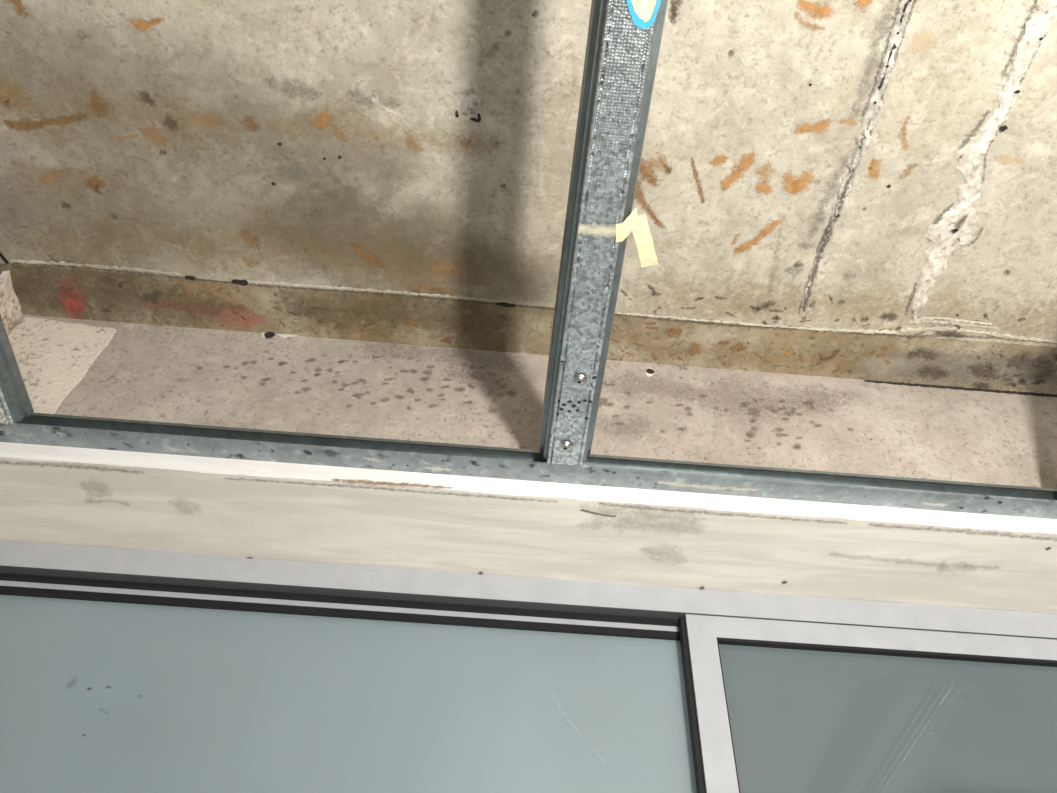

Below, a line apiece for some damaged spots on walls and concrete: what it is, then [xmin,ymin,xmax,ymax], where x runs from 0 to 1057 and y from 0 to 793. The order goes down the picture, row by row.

water stain [750,302,786,325]
water stain [856,347,1057,390]